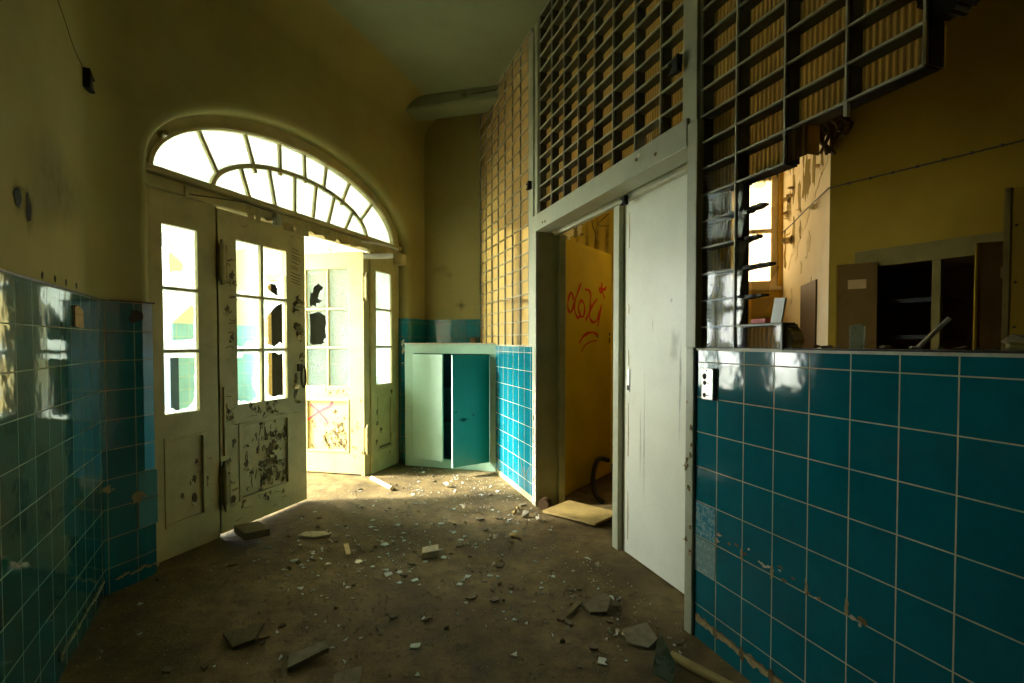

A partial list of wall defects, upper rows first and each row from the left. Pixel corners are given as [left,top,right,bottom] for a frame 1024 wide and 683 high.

spalling [683,485,716,580]
peeling [695,613,784,683]